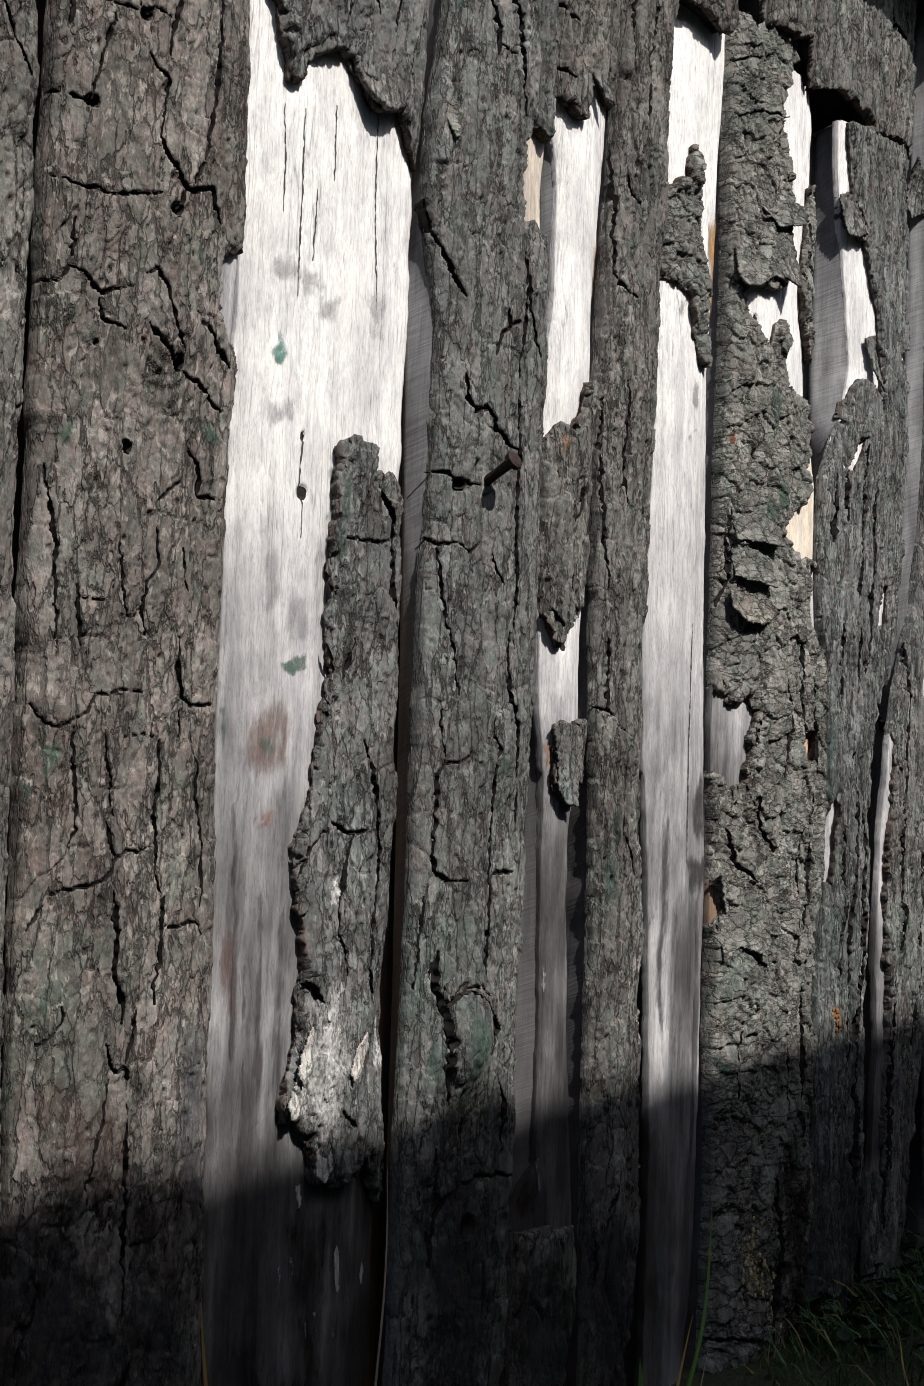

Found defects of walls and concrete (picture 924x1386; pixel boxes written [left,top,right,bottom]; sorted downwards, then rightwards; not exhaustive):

crack [4,0,231,412]
crack [283,103,338,290]
crack [373,113,381,301]
crack [416,199,467,297]
peeling [523,64,616,437]
peeling [667,4,725,279]
leakage [230,855,281,1110]
peeling [200,0,412,1386]
crack [346,252,542,1268]
peeling [508,609,581,1232]
peeling [634,278,768,1386]
leakage [278,1184,340,1386]